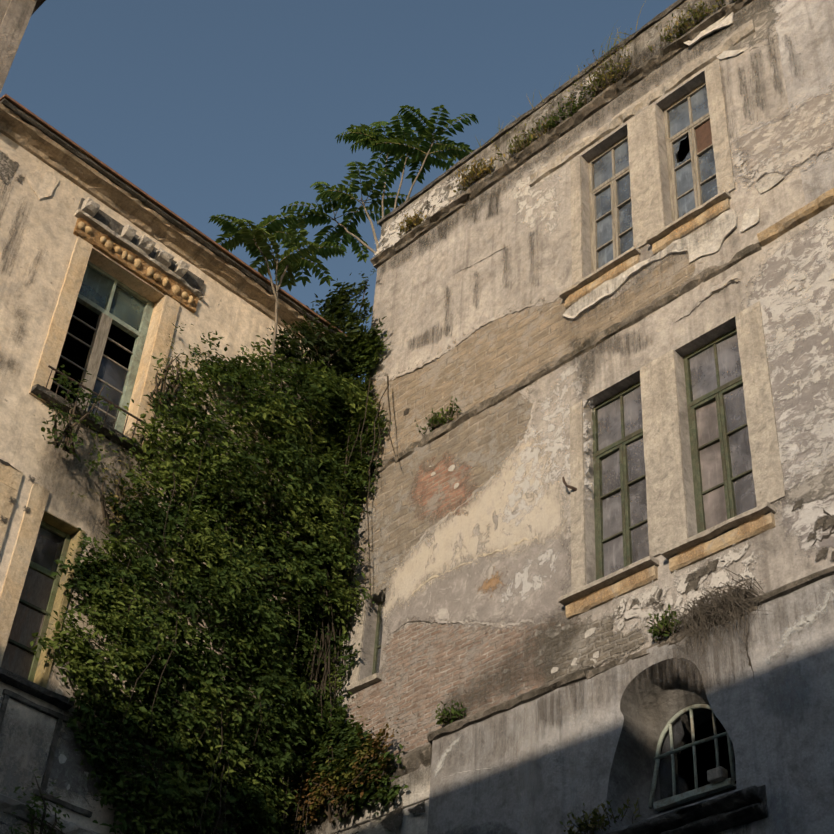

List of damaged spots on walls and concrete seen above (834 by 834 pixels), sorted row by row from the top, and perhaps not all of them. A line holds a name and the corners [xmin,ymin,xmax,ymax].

water stain [381,0,778,272]
peeling [684,0,786,63]
water stain [410,288,452,349]
flaking render [340,208,761,763]
peeling [742,213,834,562]
crack [392,620,458,633]